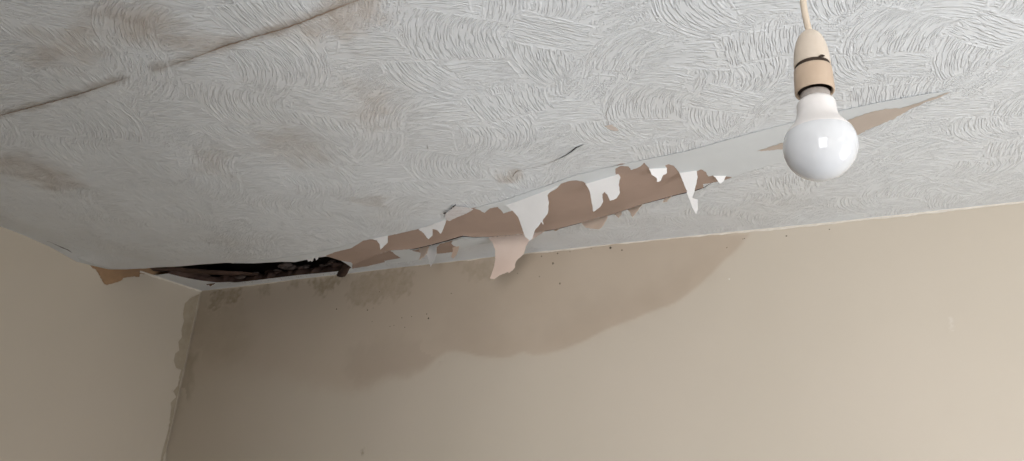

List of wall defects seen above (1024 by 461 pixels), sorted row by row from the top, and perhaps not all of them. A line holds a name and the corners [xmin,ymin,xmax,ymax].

peeling [838,91,950,135]
flaking render [90,265,167,285]
leakage [169,232,752,445]
peeling [235,122,794,279]